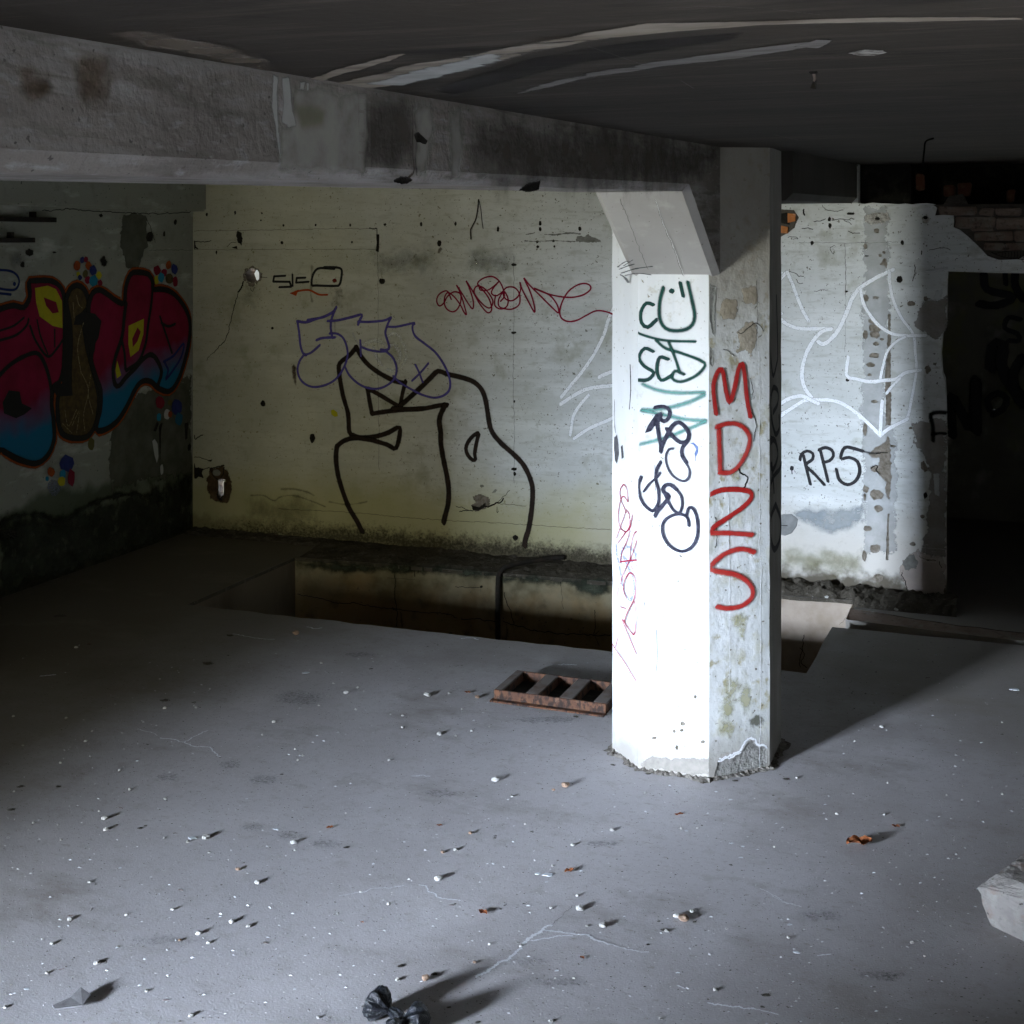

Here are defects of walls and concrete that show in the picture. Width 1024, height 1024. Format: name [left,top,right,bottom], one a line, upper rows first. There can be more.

spalling [710,284,758,357]
peeling [907,290,948,339]
spalling [194,463,232,503]
spalling [456,485,515,513]
damp [0,475,192,595]
damp [218,524,608,564]
spalling [641,721,768,777]
crack [475,906,647,978]